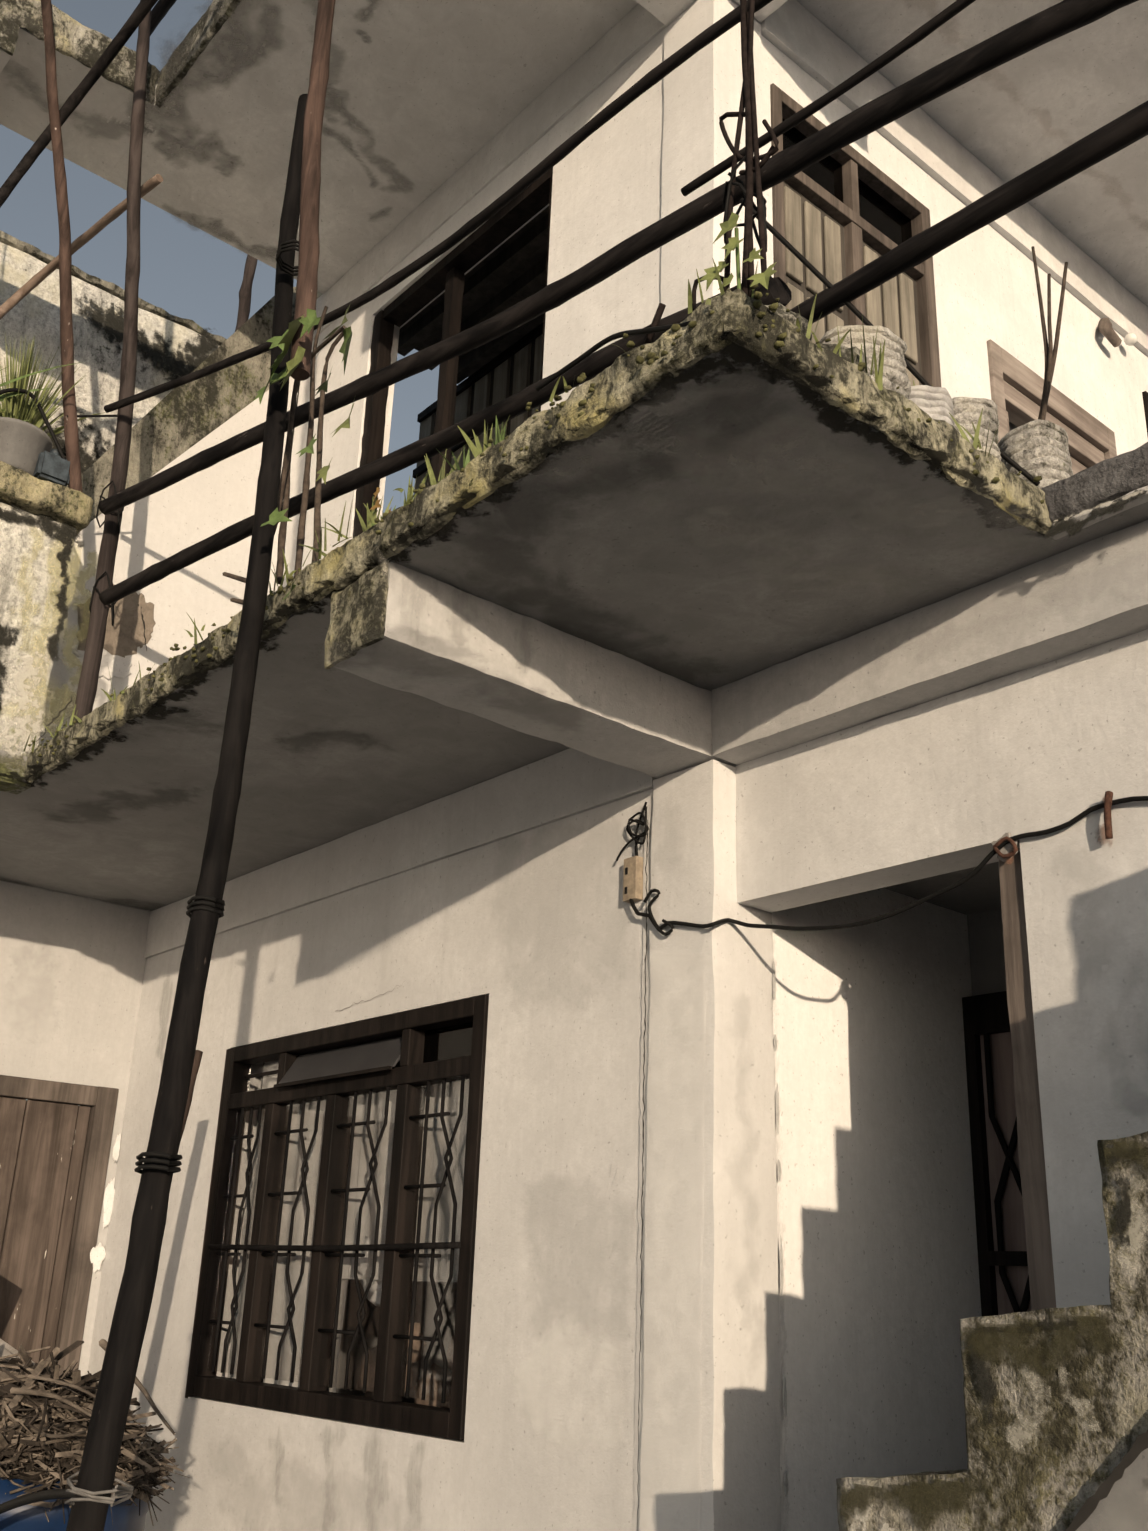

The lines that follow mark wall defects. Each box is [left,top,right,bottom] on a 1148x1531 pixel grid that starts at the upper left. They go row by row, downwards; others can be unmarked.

leakage [75,288,220,382]
leakage [40,410,111,474]
mould [259,330,1148,652]
peeling [72,584,156,680]
leakage [0,499,236,788]
mould [1107,1147,1148,1246]
mould [966,1327,1002,1424]
leakage [852,1504,894,1531]